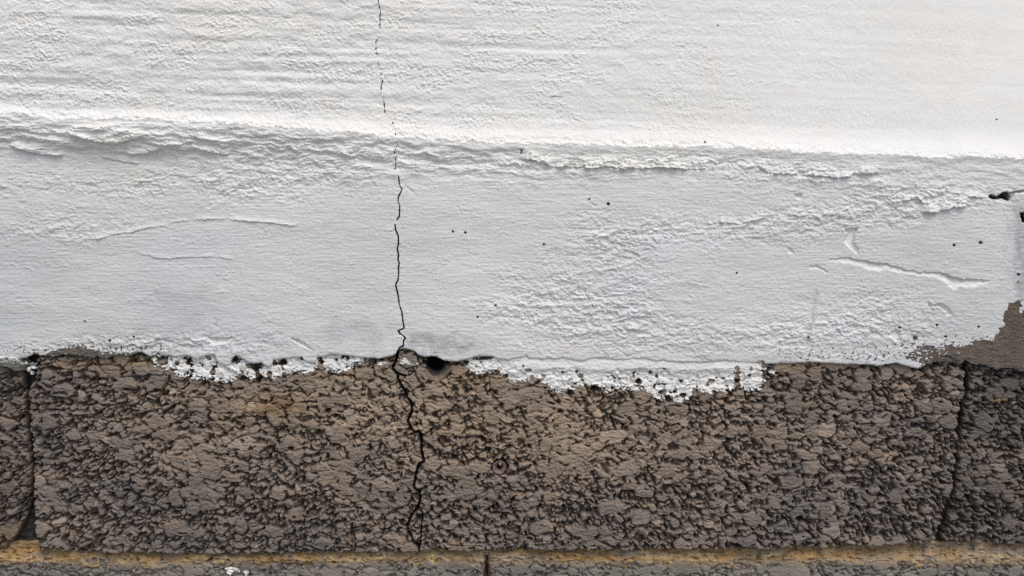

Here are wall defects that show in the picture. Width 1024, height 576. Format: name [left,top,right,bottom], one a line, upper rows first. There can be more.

crack [375,0,425,552]
peeling [0,341,167,374]
spalling [424,365,450,382]
peeling [779,300,1024,371]